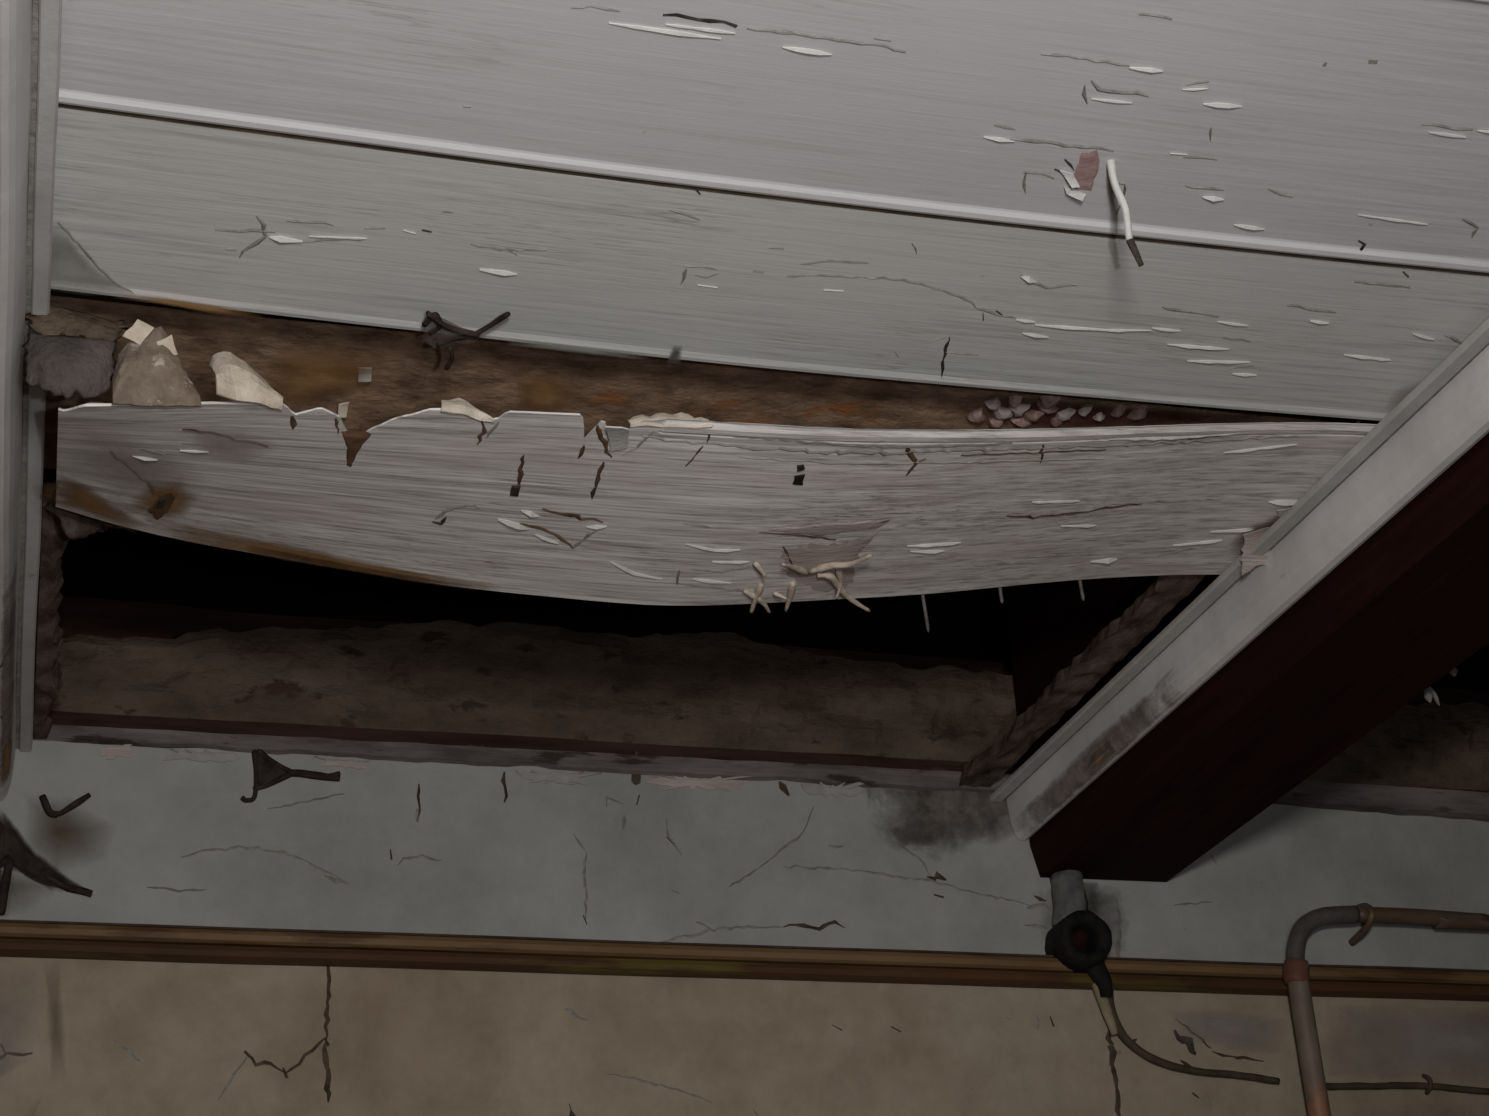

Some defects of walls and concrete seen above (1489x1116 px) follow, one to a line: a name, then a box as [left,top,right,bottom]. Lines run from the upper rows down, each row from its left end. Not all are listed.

peeling [1182,80,1242,108]
peeling [1022,150,1144,267]
peeling [1358,214,1428,225]
peeling [112,319,283,410]
peeling [358,367,372,382]
peeling [1016,306,1257,377]
peeling [338,402,349,418]
peeling [440,398,499,445]
peeling [578,412,714,459]
spalling [966,395,1225,428]
crack [218,966,331,1102]
crack [1105,1028,1121,1116]